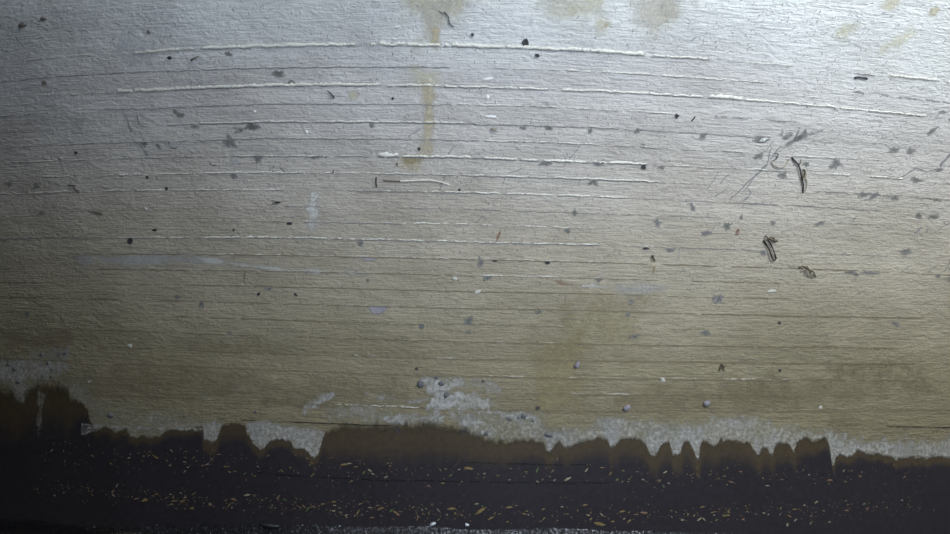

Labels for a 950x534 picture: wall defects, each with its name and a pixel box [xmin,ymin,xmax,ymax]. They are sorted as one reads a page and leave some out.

crack [901,154,950,178]
damp [0,386,950,534]